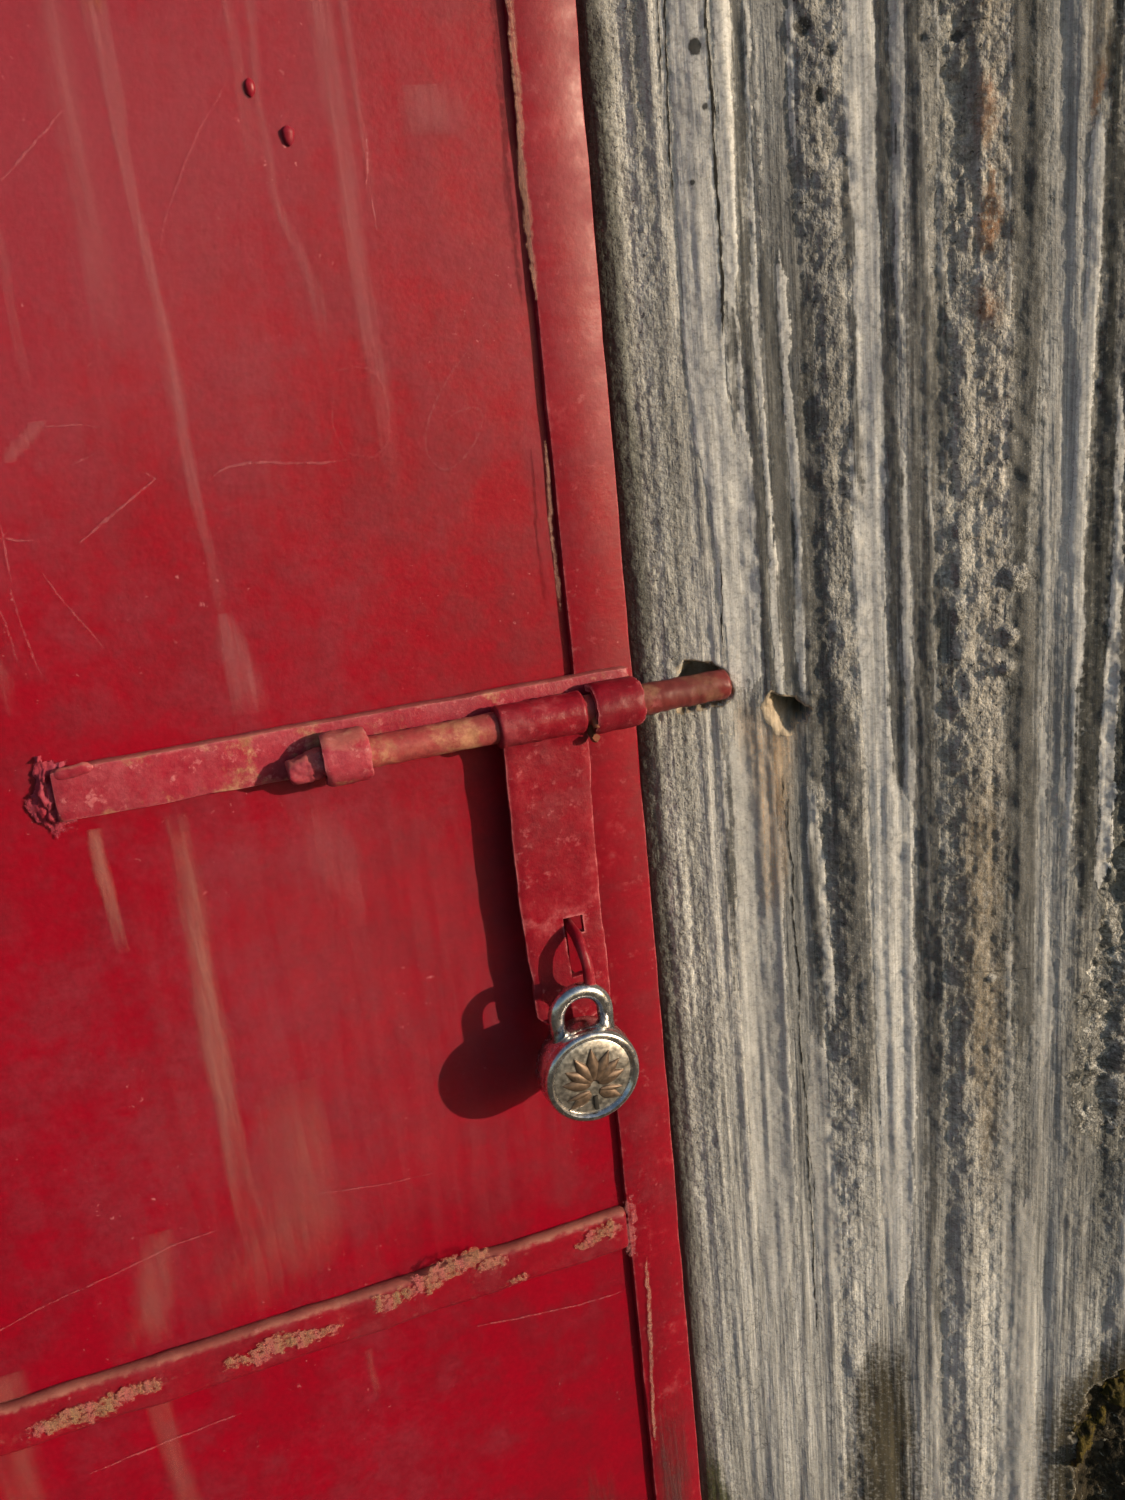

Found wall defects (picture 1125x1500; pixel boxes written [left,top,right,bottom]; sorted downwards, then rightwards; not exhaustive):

crack [657,0,674,203]
crack [704,0,725,333]
spalling [760,690,813,737]
water stain [711,0,877,1125]
water stain [876,0,953,1331]
water stain [1004,0,1125,1061]
crack [782,781,818,1327]
spalling [1066,824,1125,1164]
water stain [847,1345,921,1500]
water stain [1035,1340,1125,1500]
spalling [1068,1369,1125,1500]